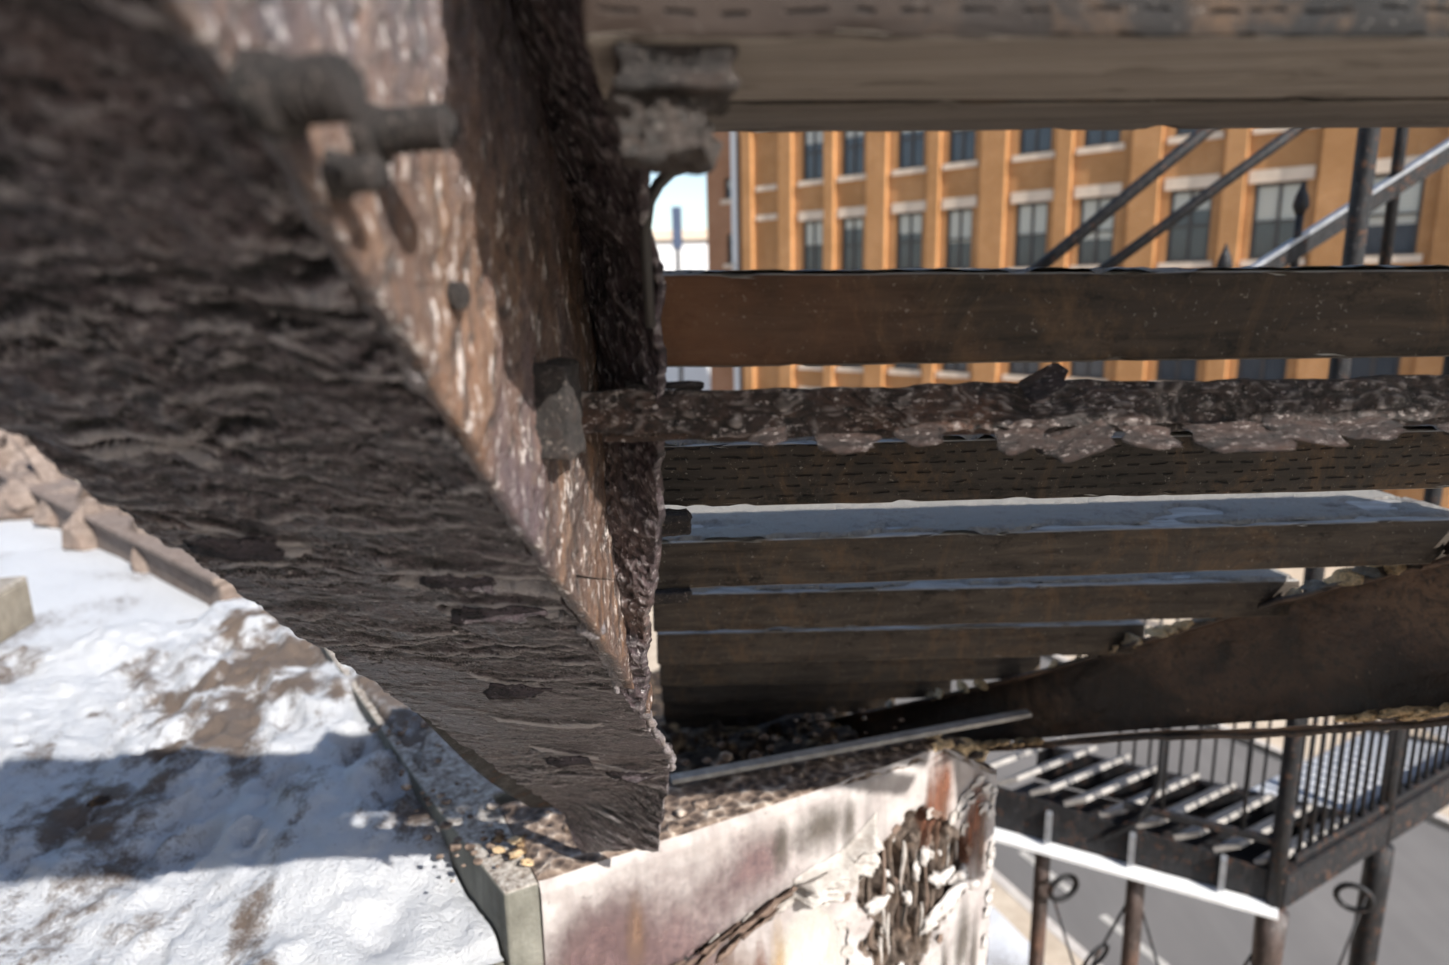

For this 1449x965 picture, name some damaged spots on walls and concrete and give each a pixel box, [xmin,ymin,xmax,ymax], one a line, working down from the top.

corrosion [605,87,723,176]
corrosion [1284,564,1423,596]
corrosion [1048,618,1218,667]
corrosion [974,737,1044,749]
corrosion [1334,702,1449,723]
corrosion [921,766,951,841]
corrosion [959,790,985,866]
corrosion [720,842,784,893]
spalling [836,775,998,965]
corrosion [593,899,725,965]
crack [673,884,798,965]
crack [843,923,851,965]